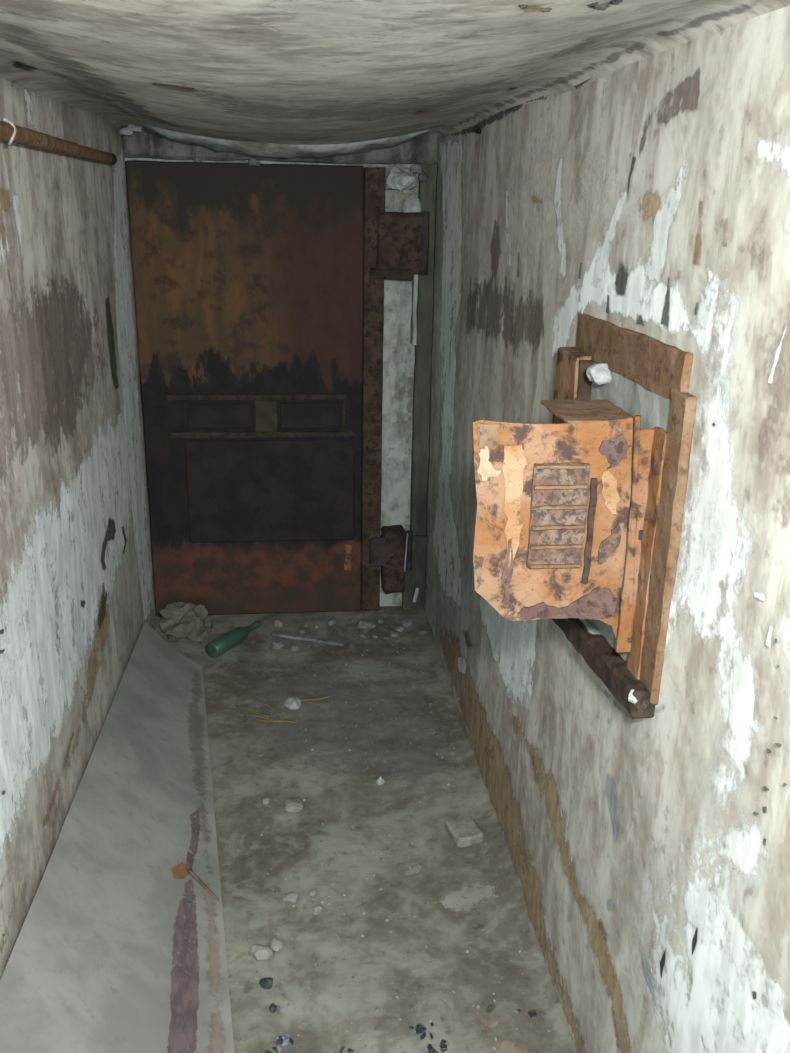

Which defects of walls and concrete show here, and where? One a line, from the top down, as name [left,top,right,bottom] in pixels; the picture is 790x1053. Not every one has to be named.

damp [248,0,467,37]
damp [688,6,750,27]
damp [0,0,175,129]
damp [203,80,501,121]
damp [451,43,643,126]
peeling [757,140,790,176]
damp [0,194,23,264]
damp [0,278,119,504]
rust [440,631,585,1053]
rust [511,716,630,1053]